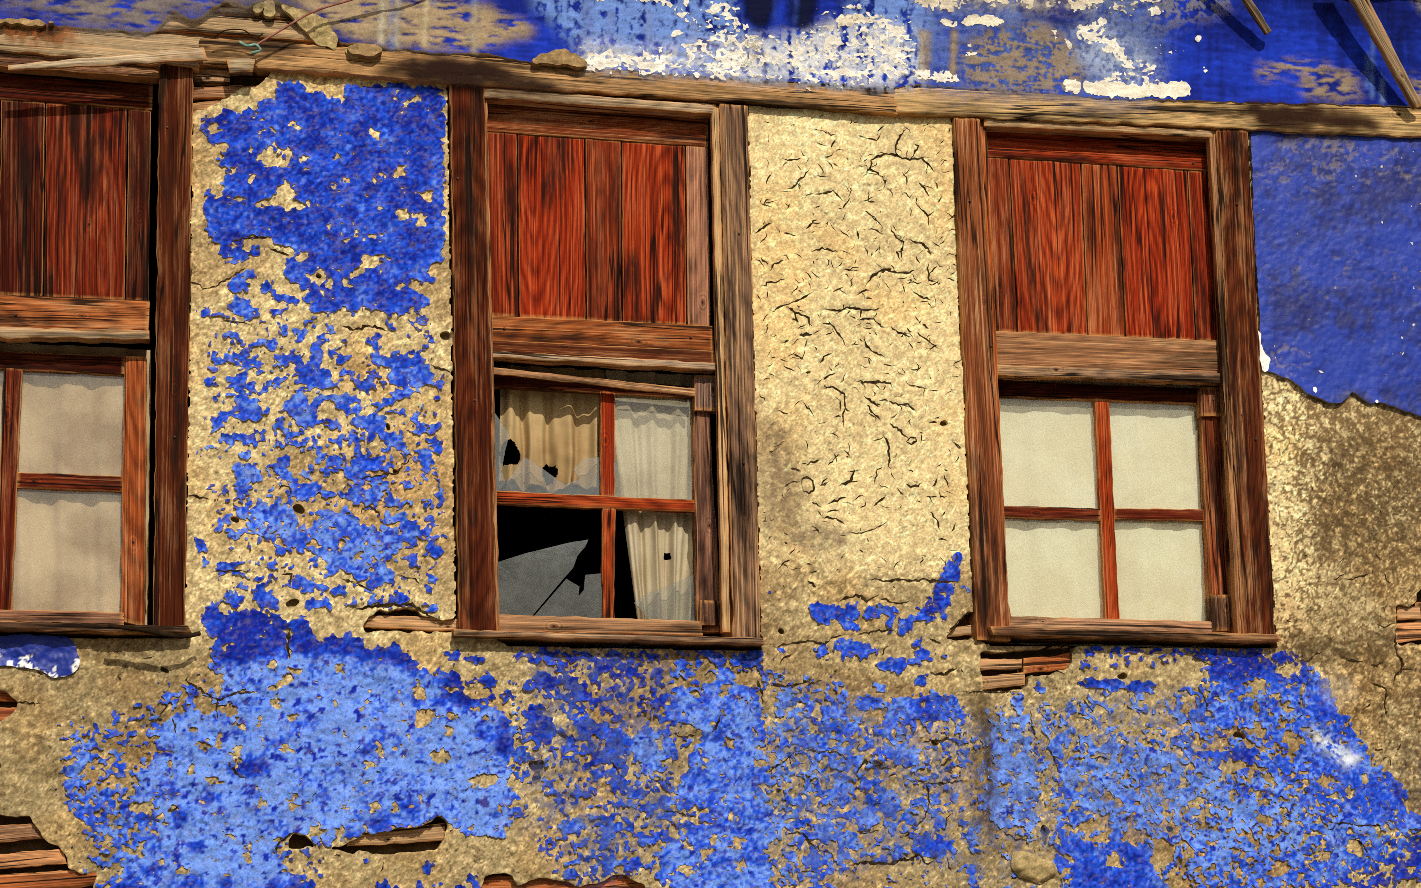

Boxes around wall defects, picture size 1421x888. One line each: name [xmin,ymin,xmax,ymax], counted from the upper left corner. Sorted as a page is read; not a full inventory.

flaking render [193,69,265,114]
peeling [580,0,1172,91]
peeling [194,79,447,611]
peeling [0,552,1421,888]
crack [756,115,1059,888]
crack [1281,476,1414,766]